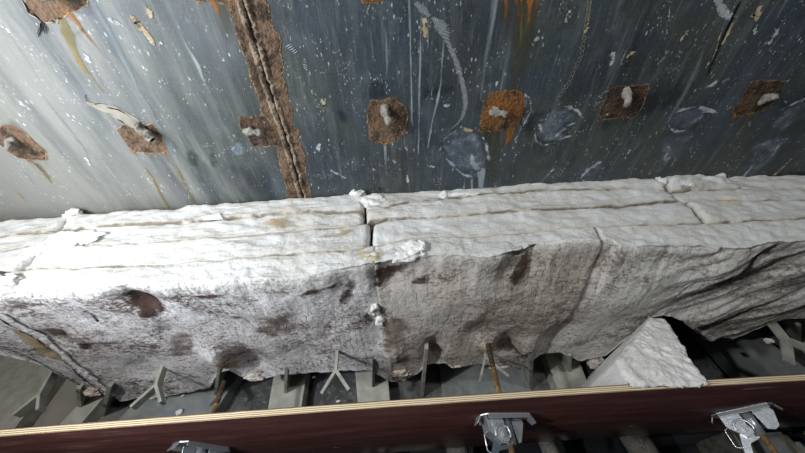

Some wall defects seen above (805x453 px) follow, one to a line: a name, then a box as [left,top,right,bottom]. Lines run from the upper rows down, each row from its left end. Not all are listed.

rust [25,0,92,75]
rust [0,125,50,181]
peeling [85,95,140,128]
rust [116,123,167,156]
rust [197,0,312,198]
rust [367,97,408,145]
rust [479,90,525,145]
rust [598,84,650,120]
rust [732,80,786,126]
damp [509,251,531,290]
damp [122,291,165,318]